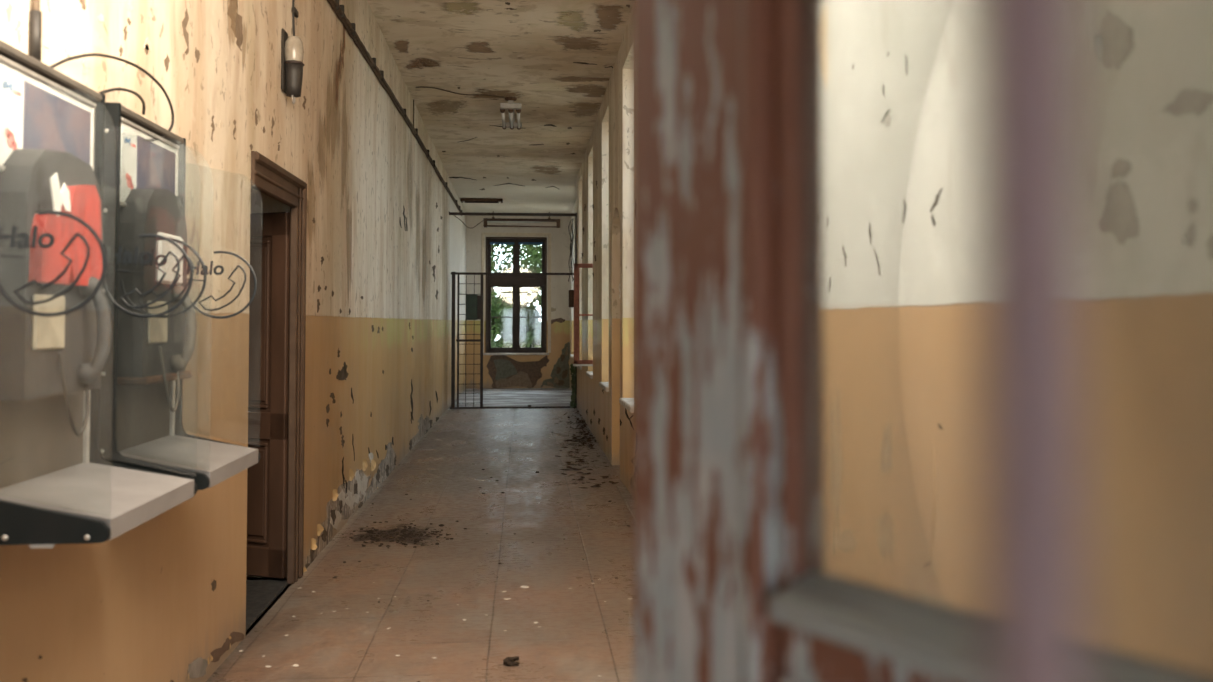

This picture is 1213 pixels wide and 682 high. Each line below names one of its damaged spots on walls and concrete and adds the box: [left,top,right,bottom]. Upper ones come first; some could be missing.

water stain [556,5,624,50]
water stain [395,41,438,69]
water stain [466,42,494,53]
water stain [472,89,519,100]
water stain [556,76,609,97]
spalling [486,341,570,388]
spalling [303,414,439,572]